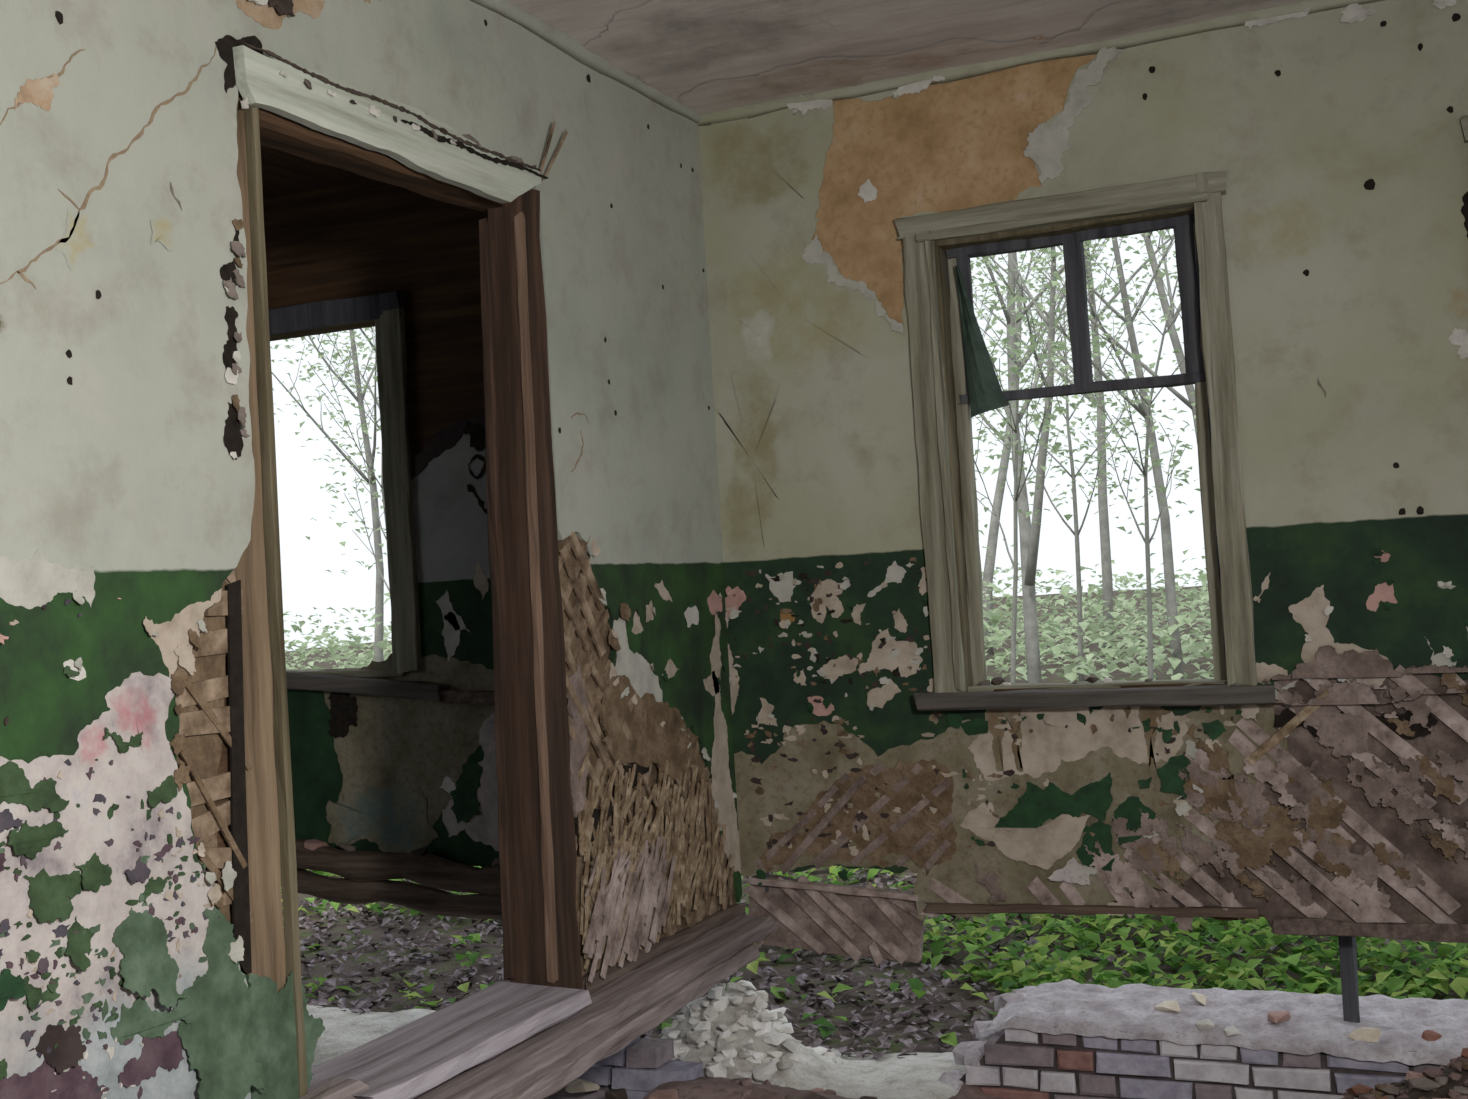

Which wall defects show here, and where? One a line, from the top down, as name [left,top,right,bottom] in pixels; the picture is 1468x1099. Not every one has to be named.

crack [0,46,217,289]
flaking render [215,0,548,179]
flaking render [787,46,1124,334]
flaking render [220,219,250,460]
peeling [0,549,95,645]
peeling [474,562,489,600]
peeling [0,571,268,1099]
peeling [324,590,499,853]
flaking render [558,532,1468,984]